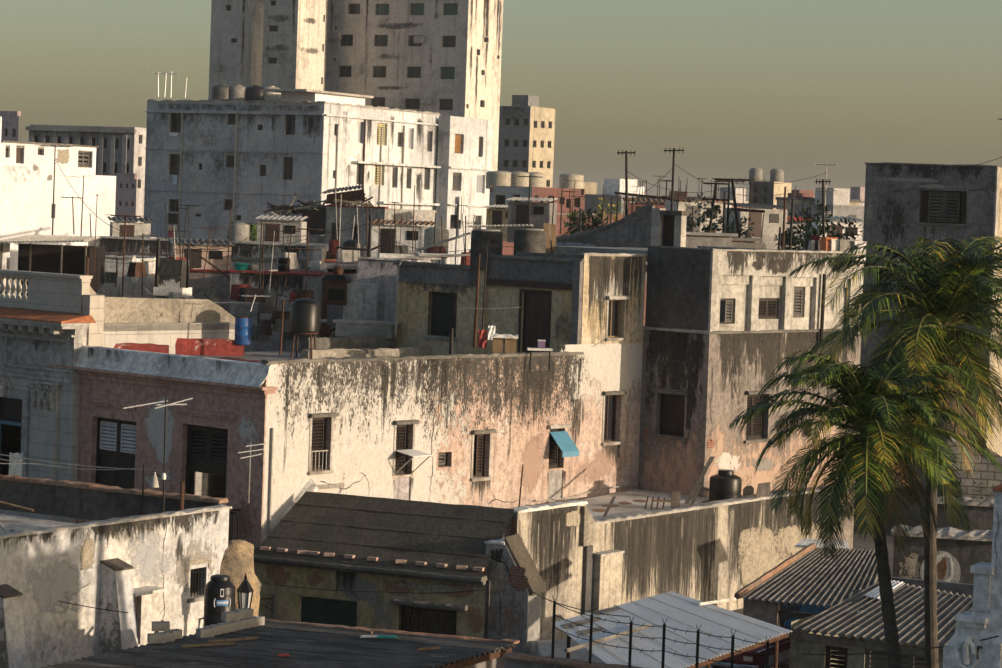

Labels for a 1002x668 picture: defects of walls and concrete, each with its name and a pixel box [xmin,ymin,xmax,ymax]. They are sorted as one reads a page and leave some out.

damp [470,0,502,102]
peeling [144,394,178,486]
damp [270,355,588,457]
damp [603,445,620,463]
damp [0,532,53,549]
peeling [29,531,95,613]
peeling [98,580,121,655]
damp [71,511,219,578]
damp [528,506,578,599]
damp [610,491,828,605]